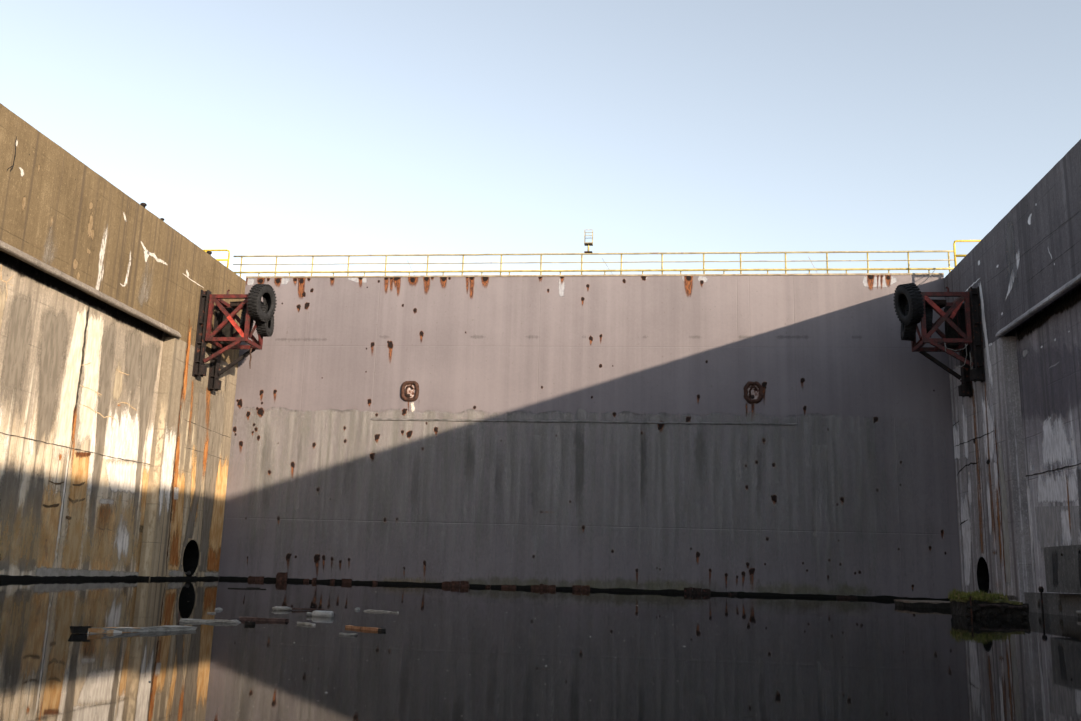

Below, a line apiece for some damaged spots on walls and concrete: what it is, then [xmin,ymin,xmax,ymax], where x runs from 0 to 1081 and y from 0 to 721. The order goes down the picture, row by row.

damp [0,202,180,577]
damp [183,331,191,400]
corrosion [358,277,451,314]
corrosion [466,277,489,298]
corrosion [684,276,704,296]
damp [1017,285,1081,341]
corrosion [0,452,150,572]
damp [169,390,224,577]
corrosion [168,390,229,572]
corrosion [972,384,996,553]
crack [1026,463,1081,477]
damp [1027,417,1081,587]